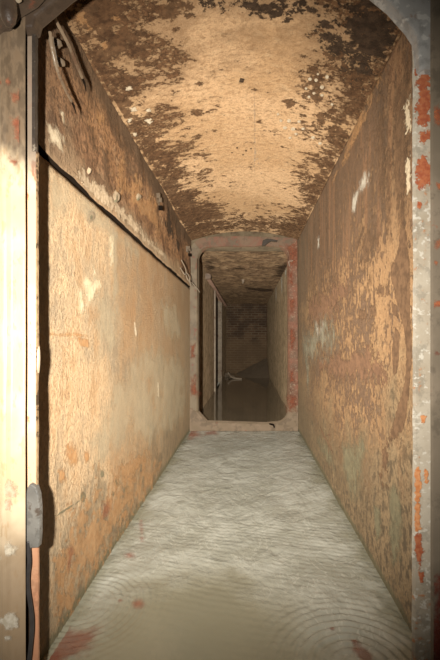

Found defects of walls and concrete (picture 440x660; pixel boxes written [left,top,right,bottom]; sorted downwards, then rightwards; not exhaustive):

peeling [65,0,398,261]
damp [376,62,409,239]
peeling [403,96,412,135]
rust [414,69,440,145]
rust [415,154,440,191]
peeling [358,157,412,488]
rust [414,467,429,583]